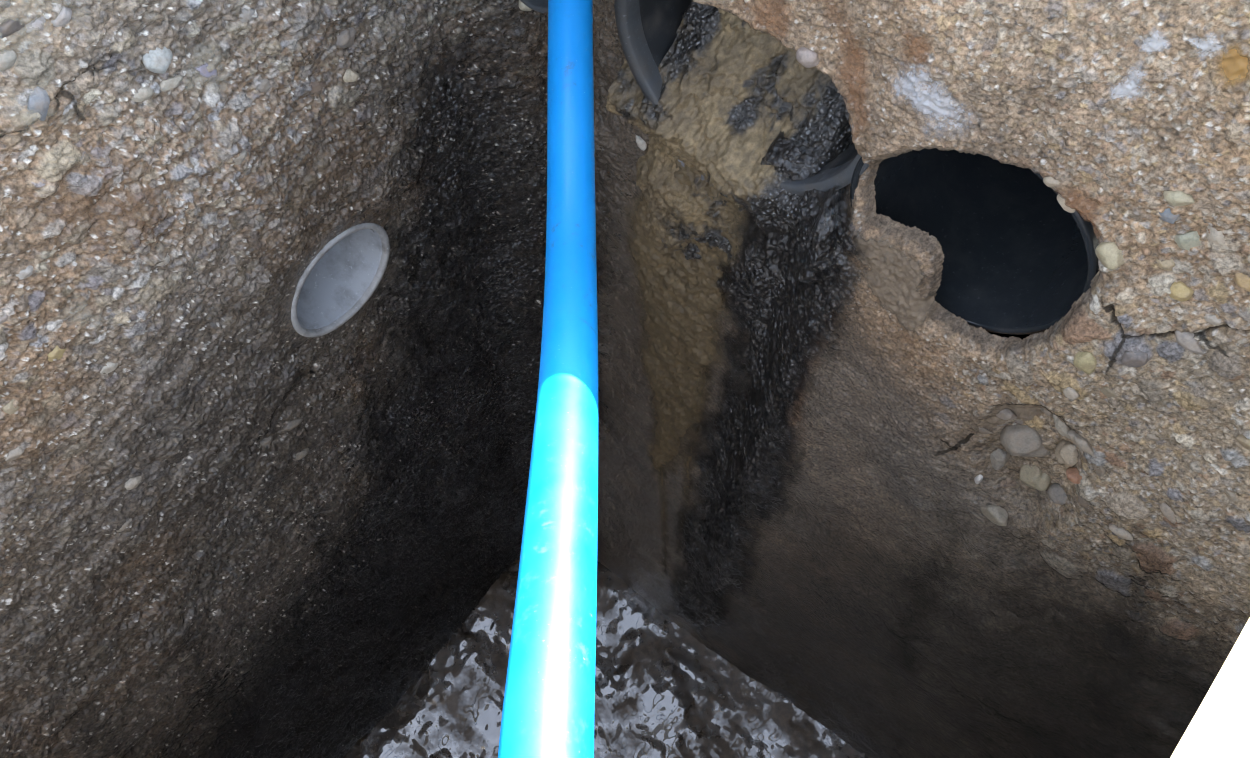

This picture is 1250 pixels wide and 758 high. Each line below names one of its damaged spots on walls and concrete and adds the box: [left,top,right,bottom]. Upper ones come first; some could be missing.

damp [205,9,547,758]
damp [628,159,861,640]
crack [1101,296,1229,375]